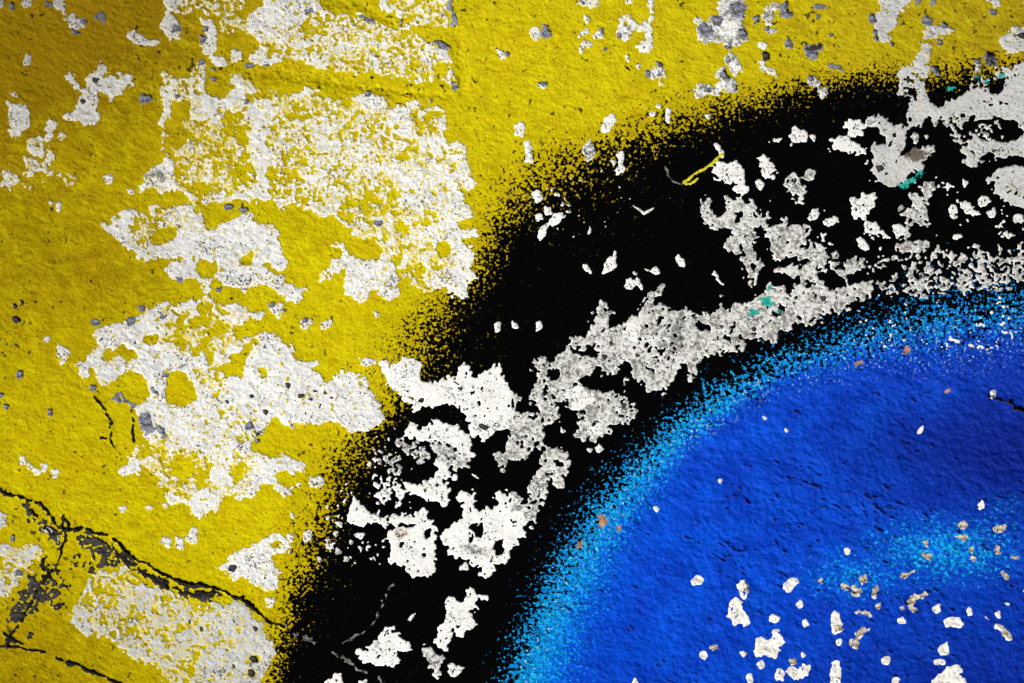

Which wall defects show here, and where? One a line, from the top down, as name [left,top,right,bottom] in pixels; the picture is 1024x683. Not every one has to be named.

peeling [0,60,135,192]
peeling [75,0,1024,579]
crack [93,396,135,448]
peeling [0,503,277,683]
crack [0,488,385,683]
peeling [355,587,489,680]
peeling [726,580,750,627]
peeling [739,614,811,683]
peeling [783,578,809,627]
peeling [831,575,881,650]
peeling [897,591,972,628]
peeling [931,642,967,683]